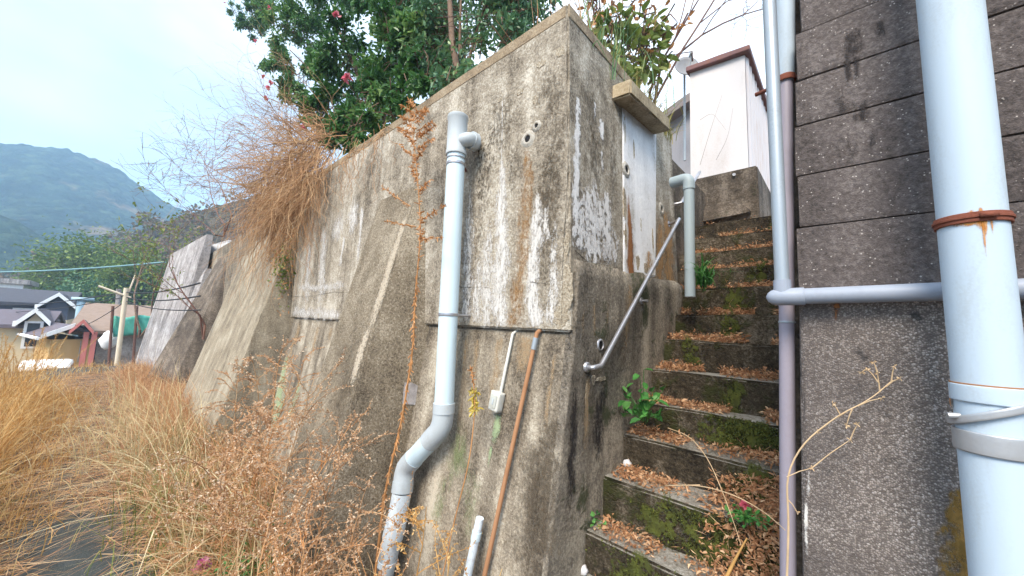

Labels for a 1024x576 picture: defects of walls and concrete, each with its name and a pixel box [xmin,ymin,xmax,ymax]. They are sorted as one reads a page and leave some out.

damp [837,30,867,119]
corrosion [511,156,532,321]
corrosion [954,208,993,247]
damp [513,361,606,567]